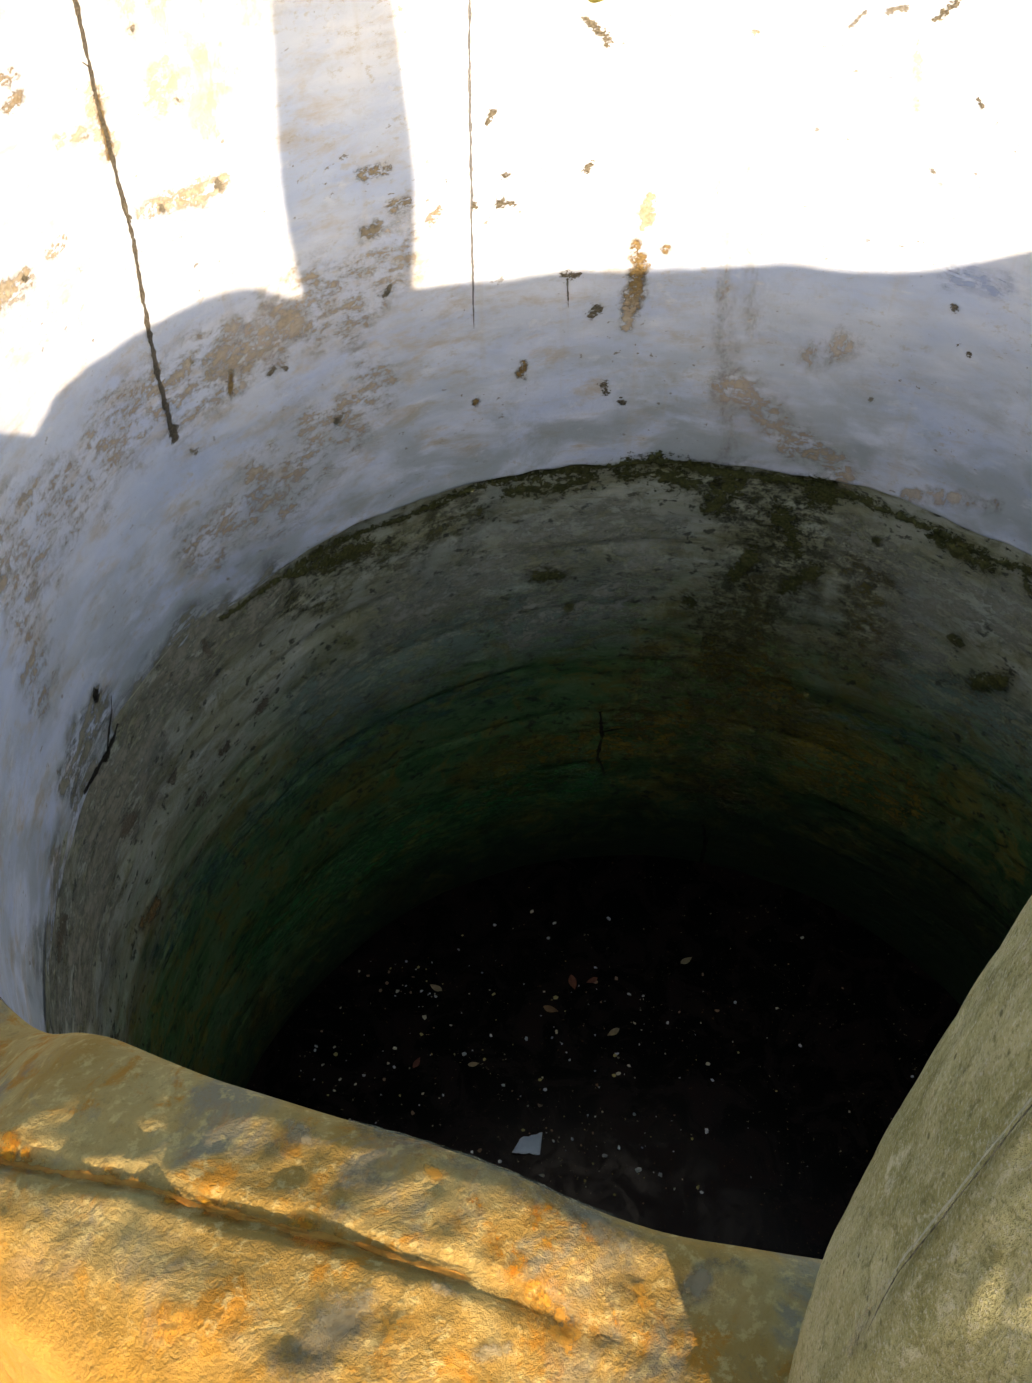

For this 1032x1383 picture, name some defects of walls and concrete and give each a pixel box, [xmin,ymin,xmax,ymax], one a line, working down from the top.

crack [72,0,179,443]
crack [468,0,478,323]
leakage [370,498,678,650]
leakage [830,525,1032,677]